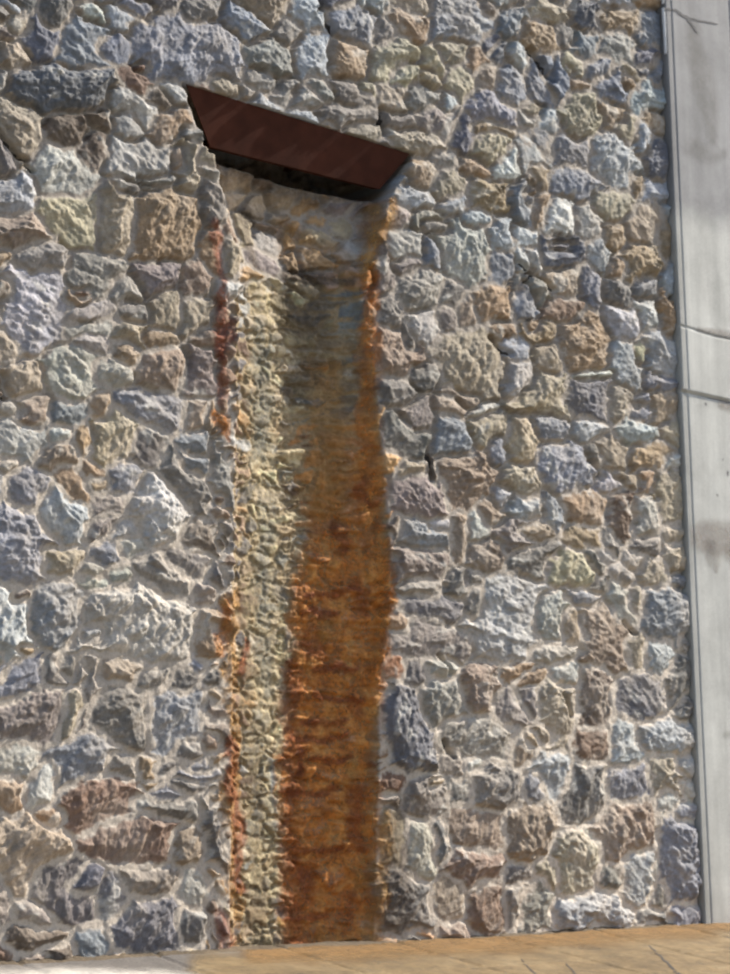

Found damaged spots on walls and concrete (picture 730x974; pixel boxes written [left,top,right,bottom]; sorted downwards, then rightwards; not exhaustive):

crack [664,8,718,33]
rust [211,219,233,356]
rust [277,199,397,944]
rust [220,735,247,921]